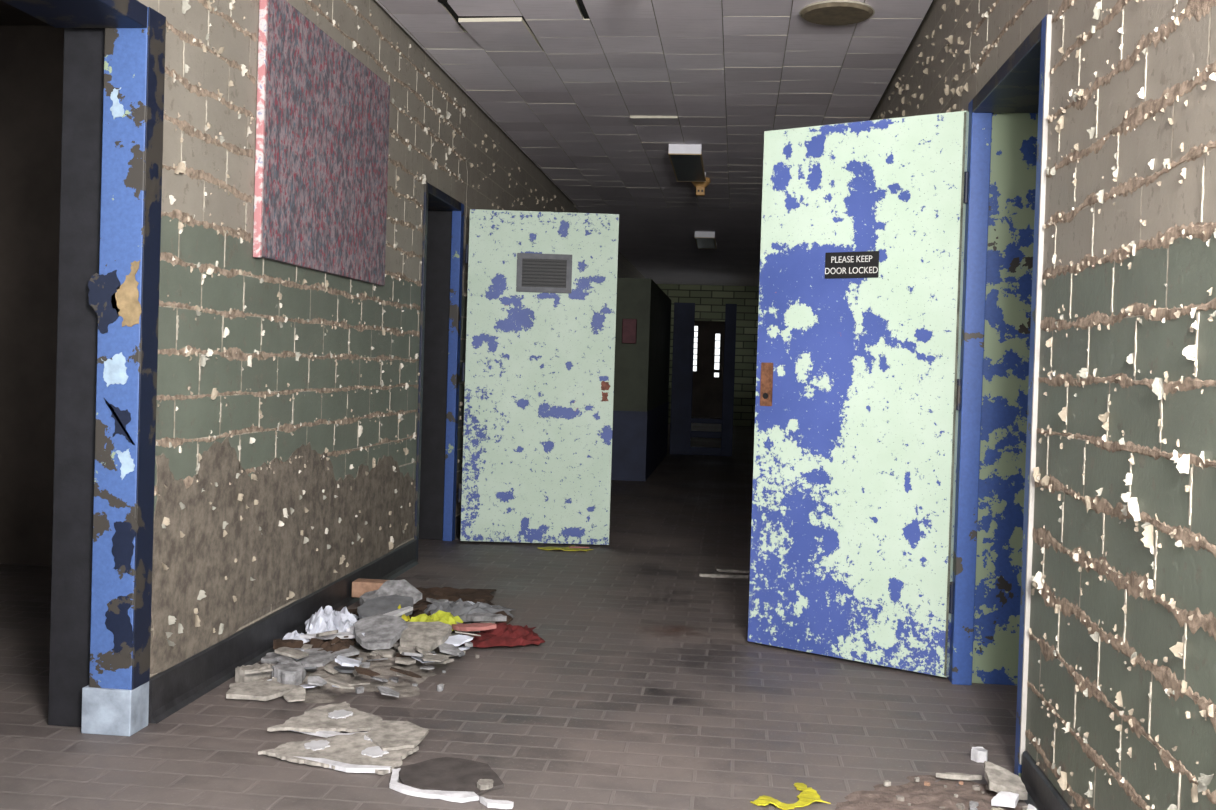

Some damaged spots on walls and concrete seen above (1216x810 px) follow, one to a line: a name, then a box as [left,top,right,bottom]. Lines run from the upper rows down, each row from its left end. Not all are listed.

peeling [878,0,1032,119]
peeling [150,0,564,674]
peeling [1025,0,1216,810]
spalling [226,680,296,701]
spalling [258,701,429,775]